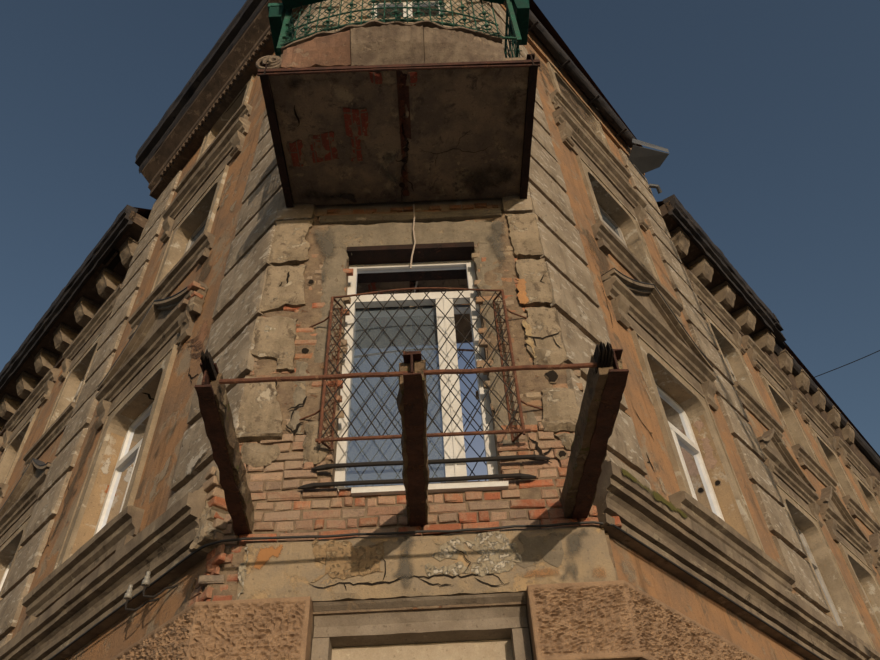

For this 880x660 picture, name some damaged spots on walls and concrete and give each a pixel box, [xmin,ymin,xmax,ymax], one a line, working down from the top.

crack [286,396,307,433]
flaking render [174,203,600,616]
crack [308,547,508,588]